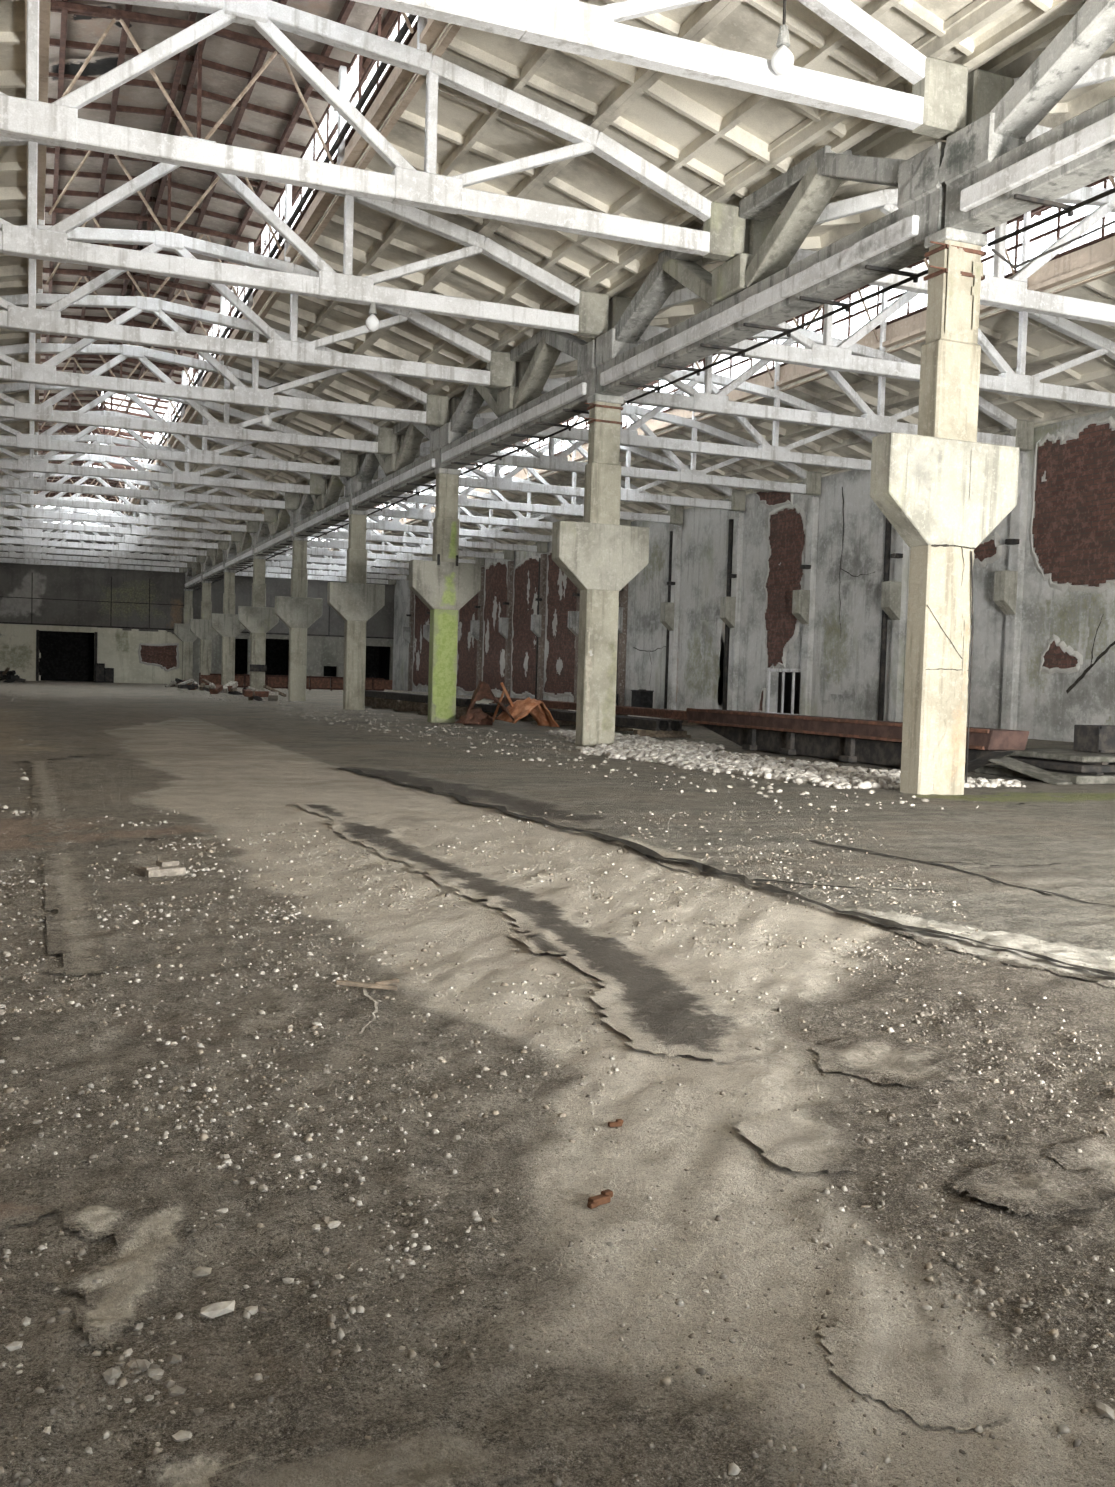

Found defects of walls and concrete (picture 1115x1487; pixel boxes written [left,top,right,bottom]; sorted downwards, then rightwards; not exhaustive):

spalling [1017,416,1115,594]
spalling [138,643,180,672]
spalling [456,550,593,732]
spalling [753,489,807,713]
spalling [1039,634,1083,675]
water stain [295,803,767,1062]